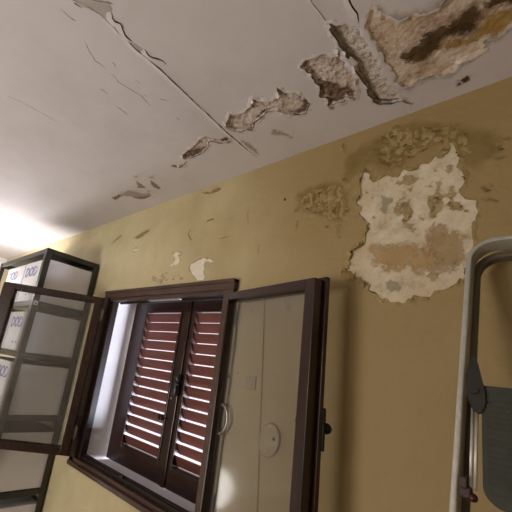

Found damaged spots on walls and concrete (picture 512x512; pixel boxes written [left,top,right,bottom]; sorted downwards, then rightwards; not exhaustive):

crack [60,0,259,159]
flaking render [297,0,512,111]
water stain [399,0,512,63]
flaking render [172,86,313,168]
peeling [132,176,160,200]
peeling [338,142,481,307]
peeling [188,256,214,282]